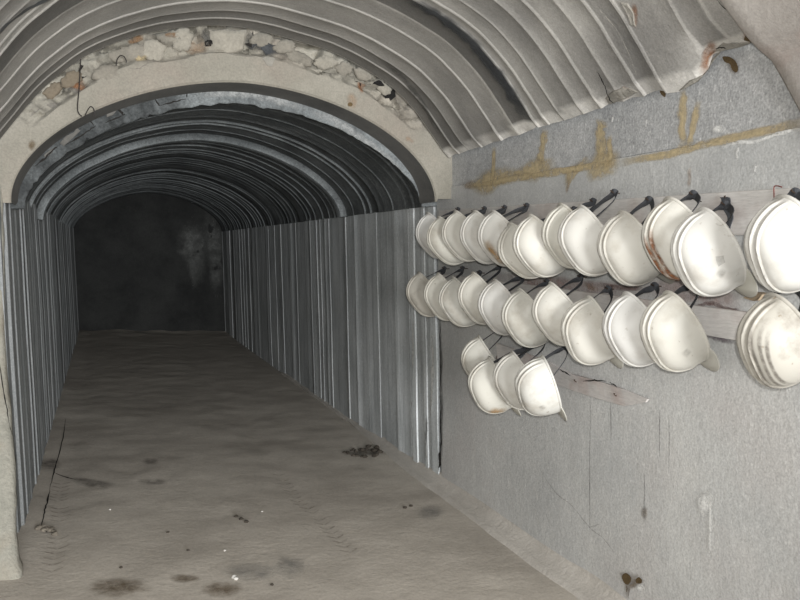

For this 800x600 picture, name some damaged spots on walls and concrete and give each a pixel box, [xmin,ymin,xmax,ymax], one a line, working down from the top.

spalling [42,27,396,101]
peeling [44,128,81,157]
crack [41,419,72,533]
crack [585,445,593,515]